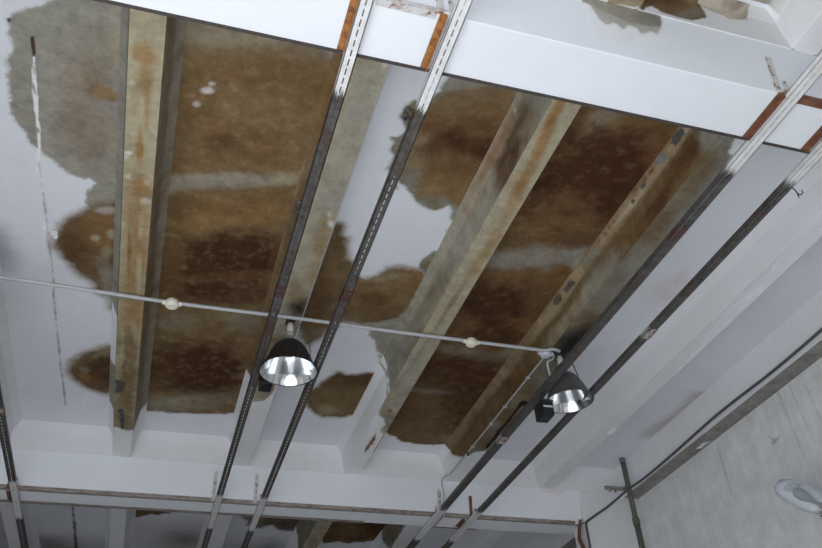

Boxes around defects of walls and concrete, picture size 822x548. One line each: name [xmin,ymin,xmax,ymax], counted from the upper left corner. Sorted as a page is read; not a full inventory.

leakage [583,0,707,33]
peeling [699,0,749,19]
crack [31,37,41,171]
crack [42,224,57,253]
leakage [6,0,130,322]
corrosion [113,9,167,430]
leakage [133,17,734,457]
leakage [68,335,117,423]